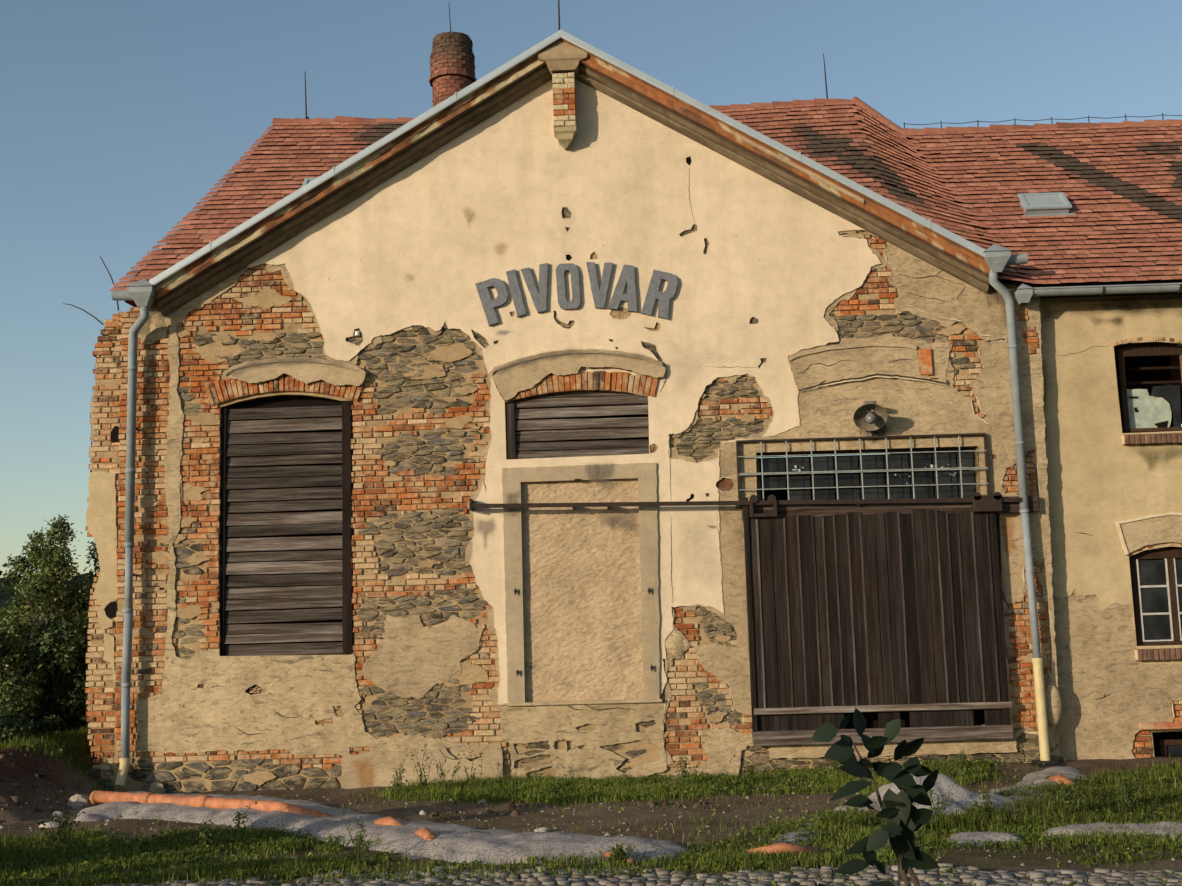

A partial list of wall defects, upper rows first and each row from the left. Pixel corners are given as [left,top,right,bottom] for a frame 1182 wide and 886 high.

flaking render [824,229,1007,426]
flaking render [1017,304,1039,354]
flaking render [650,358,774,463]
flaking render [85,265,582,794]
flaking render [1001,446,1041,513]
flaking render [603,744,647,773]
flaking render [637,605,844,775]
flaking render [857,558,1100,765]
flaking render [1131,730,1152,758]
flaking render [1172,698,1182,722]